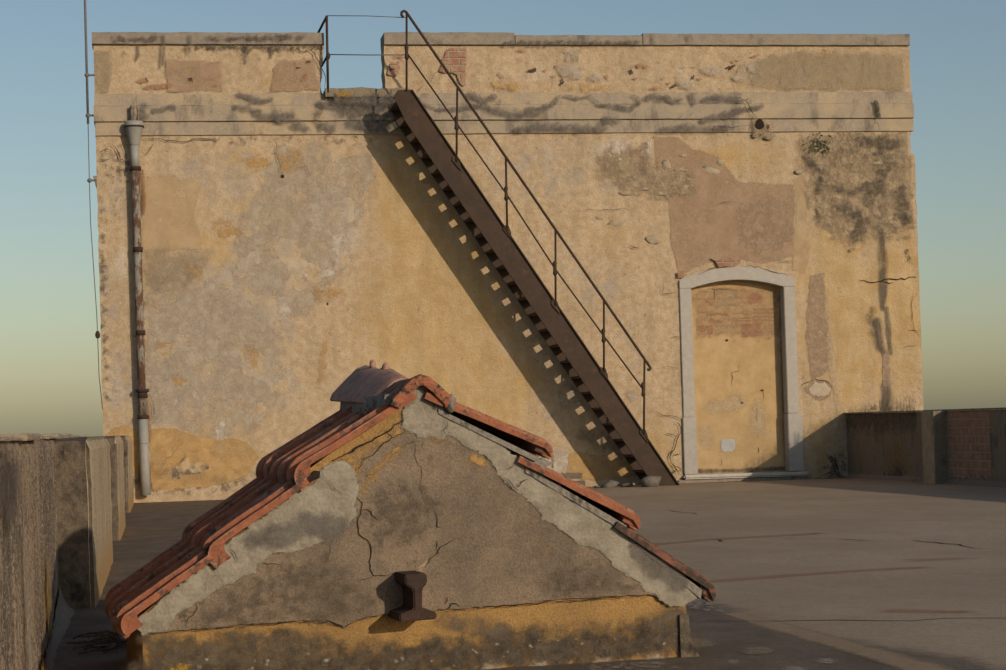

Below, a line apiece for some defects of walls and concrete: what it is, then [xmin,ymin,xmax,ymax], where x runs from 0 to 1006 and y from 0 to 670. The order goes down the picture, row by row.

water stain [233,93,399,132]
water stain [418,92,764,133]
spalling [597,140,695,200]
water stain [856,134,900,155]
water stain [804,155,912,252]
water stain [870,228,892,354]
crack [860,277,919,349]
crack [321,419,457,582]
water stain [131,609,685,670]